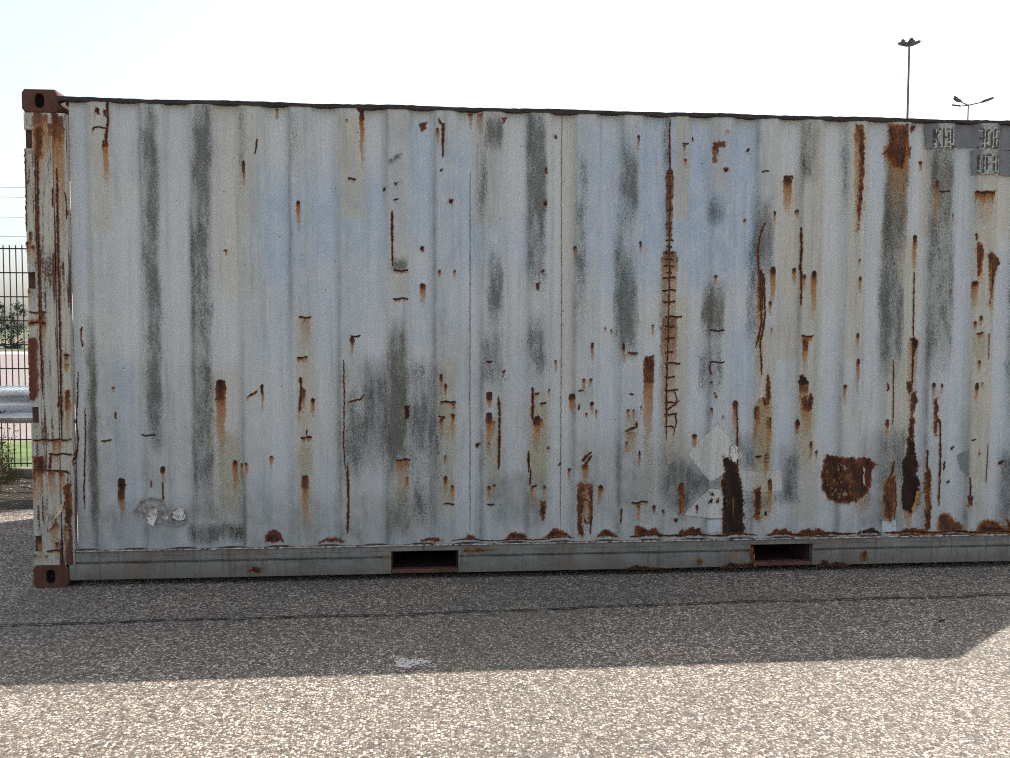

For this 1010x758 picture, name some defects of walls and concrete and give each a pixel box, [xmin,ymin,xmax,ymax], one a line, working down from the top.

corrosion [23,111,64,255]
corrosion [854,124,866,231]
corrosion [882,124,922,179]
corrosion [28,337,39,401]
corrosion [57,389,77,423]
corrosion [215,380,226,430]
corrosion [420,233,1010,568]
corrosion [62,483,75,529]